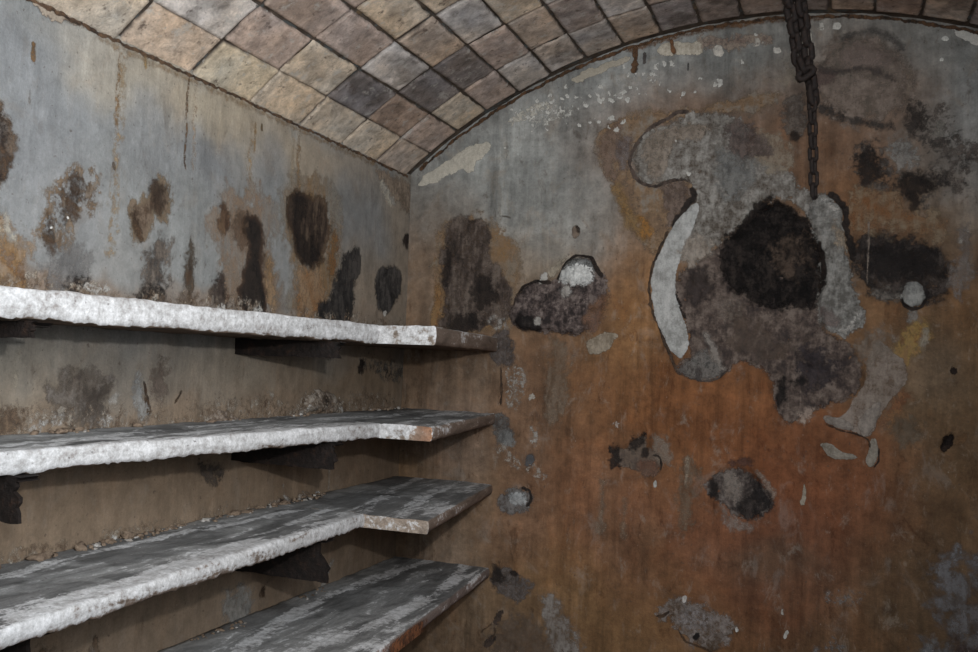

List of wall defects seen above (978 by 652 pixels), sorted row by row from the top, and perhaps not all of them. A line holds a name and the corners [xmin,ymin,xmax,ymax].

leakage [36,163,101,293]
leakage [127,173,175,302]
leakage [179,202,267,312]
leakage [286,188,332,270]
leakage [317,247,361,321]
peeling [375,142,491,213]
leakage [430,211,523,367]
flaking render [632,111,907,467]
flaking render [850,221,957,322]
flaking render [608,432,673,487]
flaking render [703,458,776,530]
flaking render [654,595,738,652]